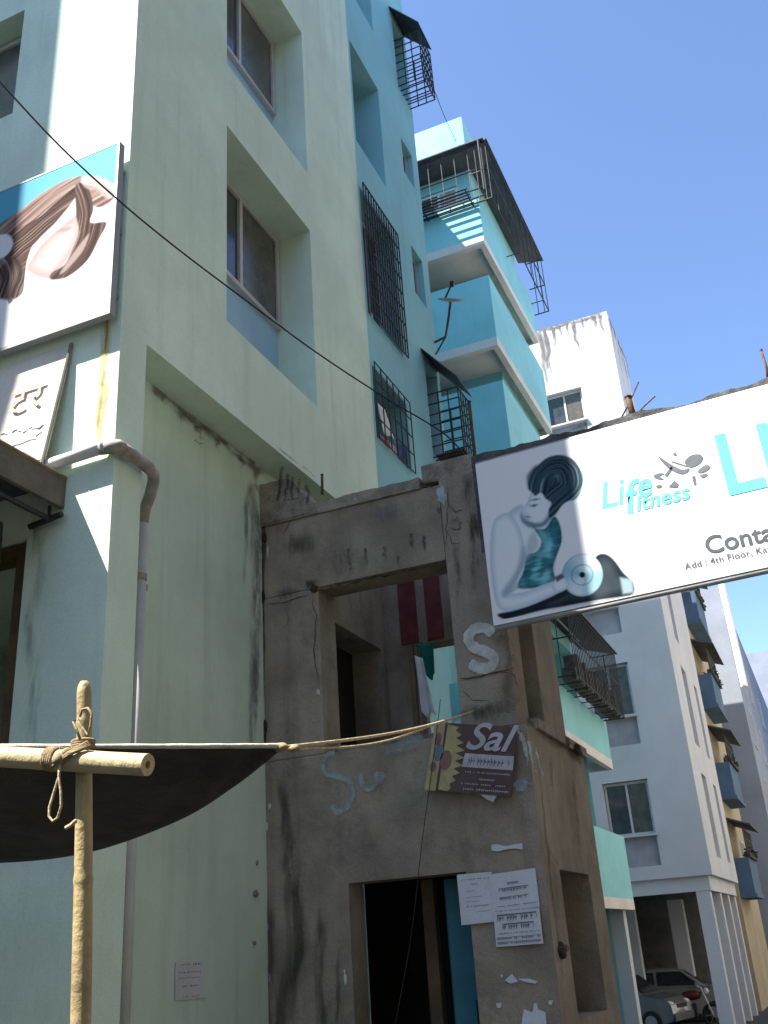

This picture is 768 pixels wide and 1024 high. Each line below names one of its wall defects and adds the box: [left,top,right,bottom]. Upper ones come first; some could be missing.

rust [95,320,109,442]
water stain [154,387,227,444]
water stain [537,312,629,381]